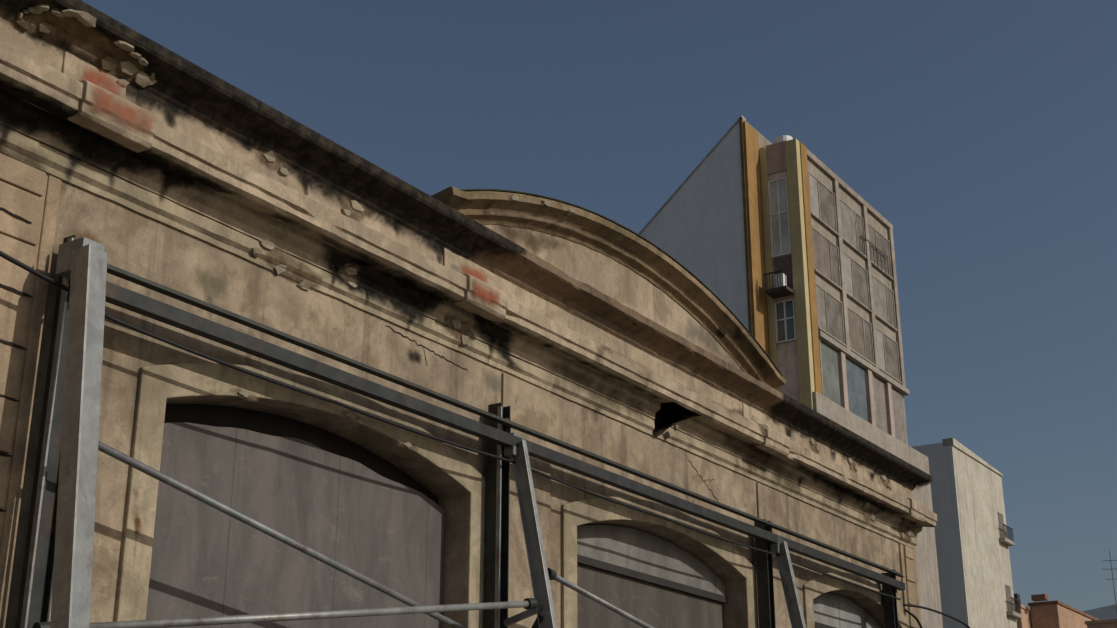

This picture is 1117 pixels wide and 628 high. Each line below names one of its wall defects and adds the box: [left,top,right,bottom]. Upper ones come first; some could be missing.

spalling [15,4,157,88]
damp [0,0,546,264]
crack [387,326,468,371]
spalling [652,402,695,439]
damp [767,394,933,489]